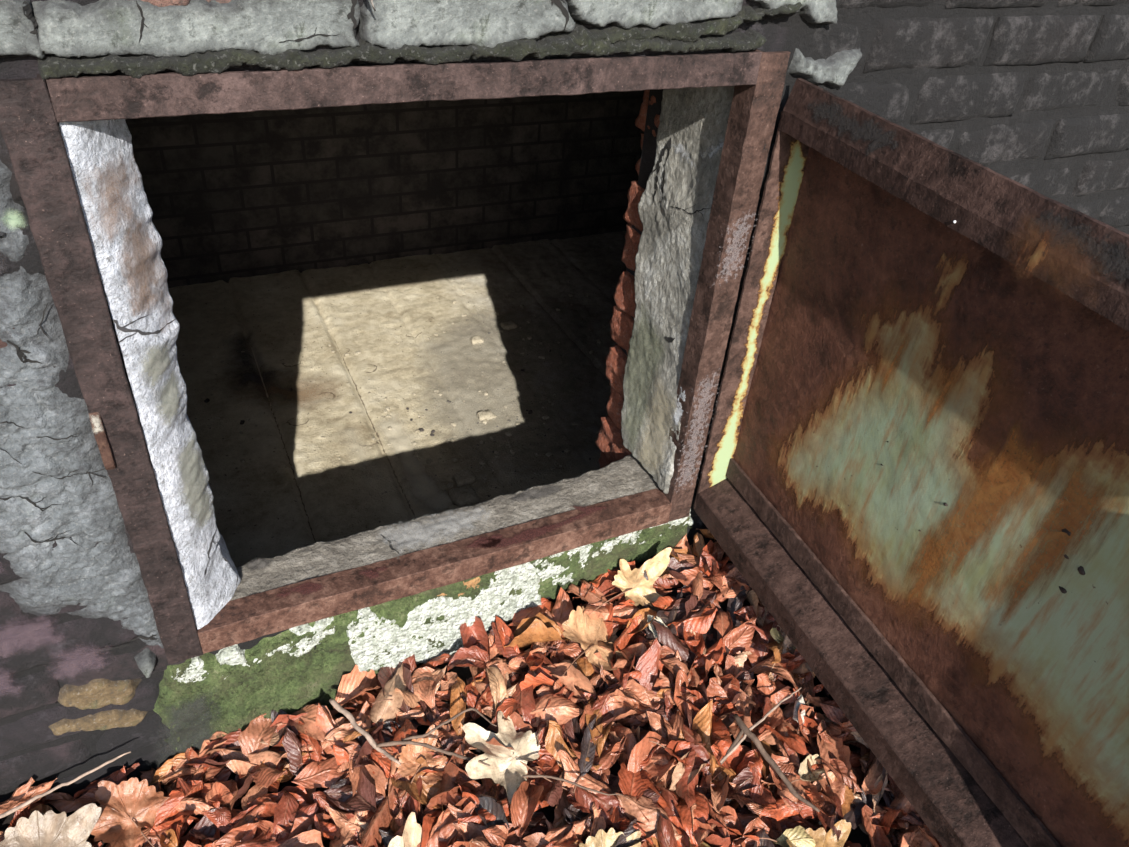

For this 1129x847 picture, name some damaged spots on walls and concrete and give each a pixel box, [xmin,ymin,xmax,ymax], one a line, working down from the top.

peeling [144,345,179,423]
crack [0,421,108,548]
corrosion [466,506,606,548]
corrosion [277,582,322,597]
flaking render [49,678,148,735]